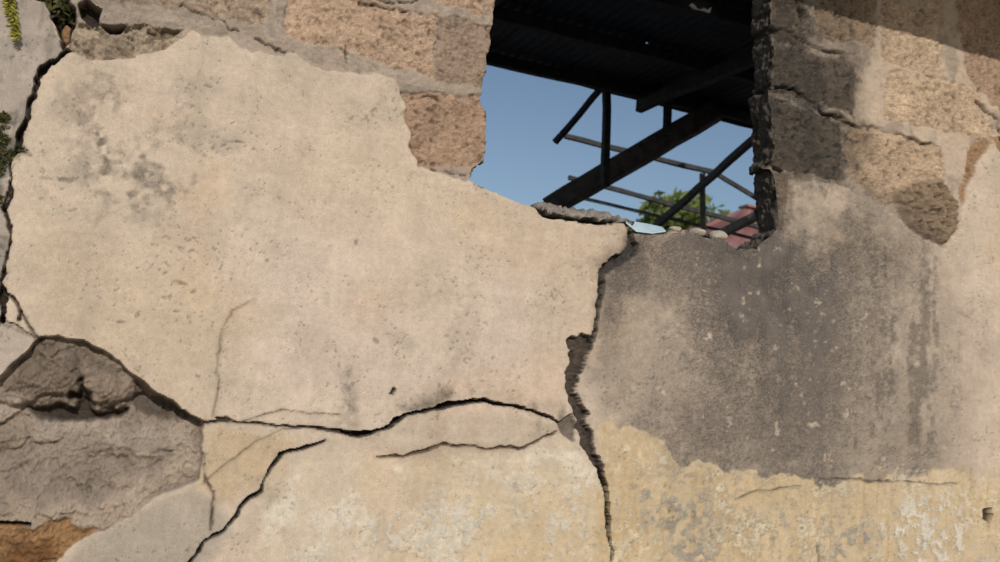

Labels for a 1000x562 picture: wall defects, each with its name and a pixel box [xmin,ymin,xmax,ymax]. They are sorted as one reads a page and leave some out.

crack [0,46,72,341]
spalling [35,0,193,62]
spalling [729,0,780,250]
spalling [0,334,235,562]
crack [188,226,638,562]